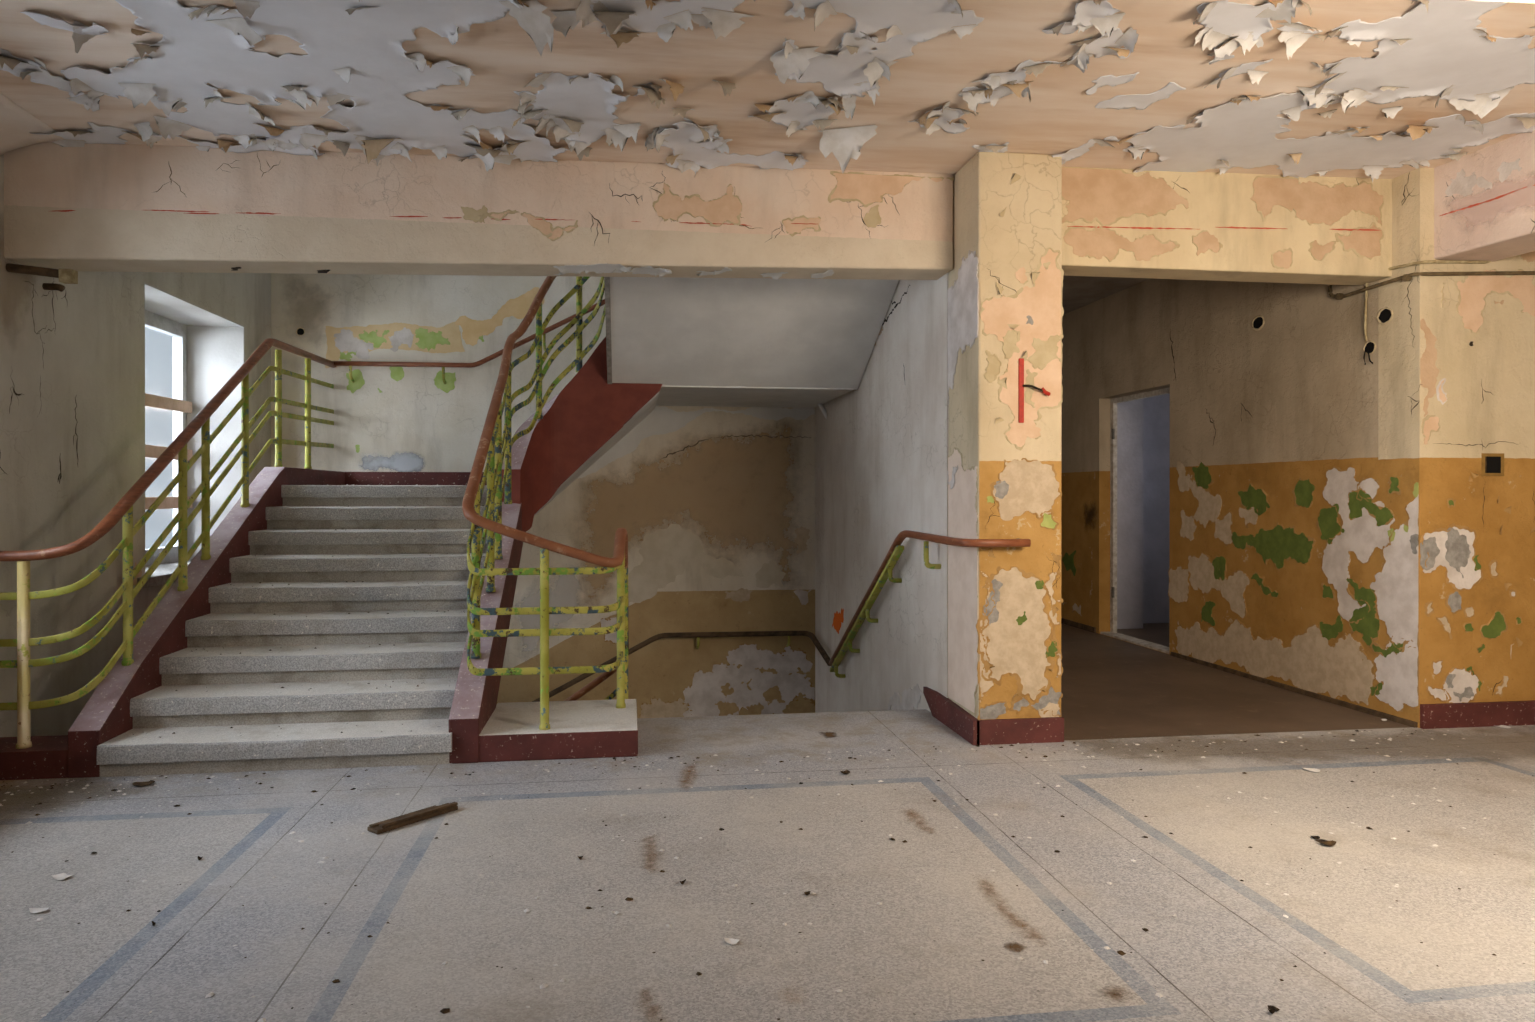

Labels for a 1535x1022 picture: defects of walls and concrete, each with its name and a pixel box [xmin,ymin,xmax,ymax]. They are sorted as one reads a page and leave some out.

peeling [0,0,984,241]
peeling [553,263,672,277]
peeling [325,287,545,368]
peeling [907,0,1535,721]
peeling [682,643,815,717]